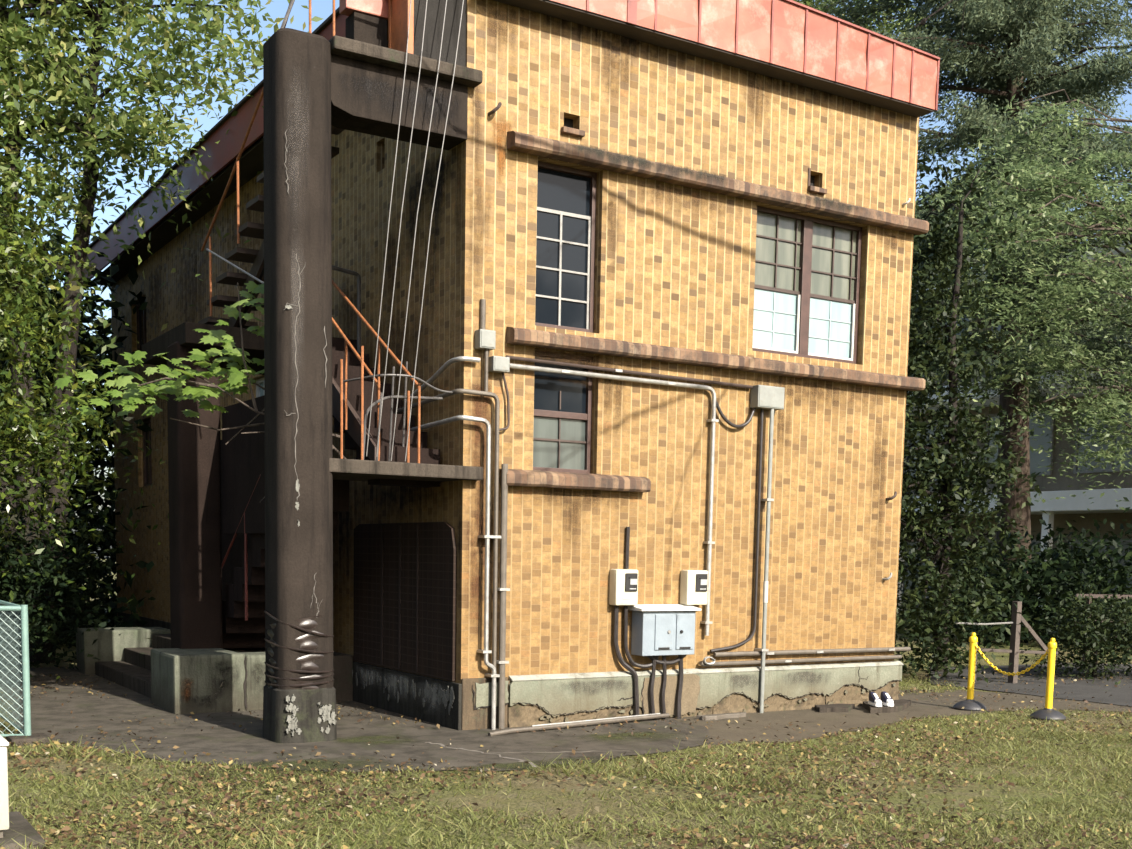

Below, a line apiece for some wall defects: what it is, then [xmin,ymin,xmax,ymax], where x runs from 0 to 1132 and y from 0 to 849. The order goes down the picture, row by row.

crack [284,253,306,498]
crack [321,326,329,388]
peeling [352,669,455,715]
peeling [472,672,899,728]